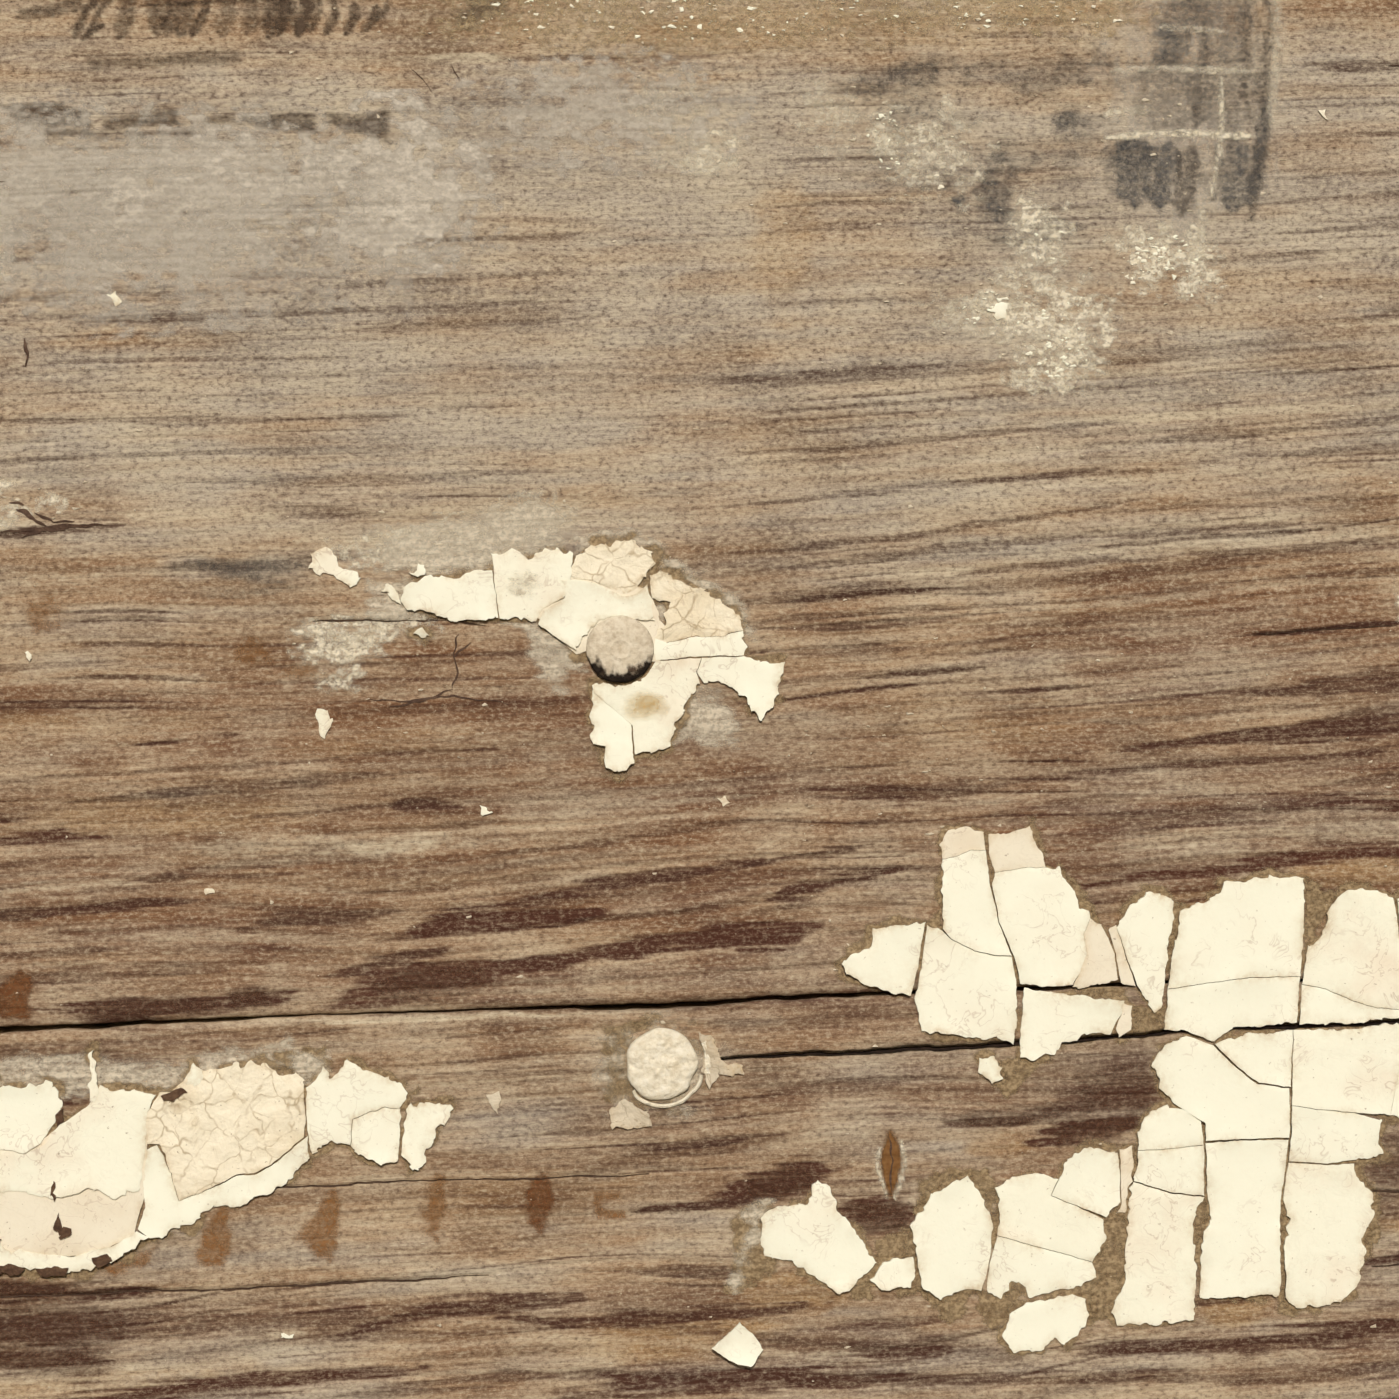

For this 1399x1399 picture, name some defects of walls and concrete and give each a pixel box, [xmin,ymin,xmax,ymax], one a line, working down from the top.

peeling [308,493,787,782]
peeling [0,1038,455,1282]
crack [721,1041,1019,1060]
peeling [723,818,1399,1356]
crack [1062,1030,1185,1043]
crack [1232,1020,1399,1029]